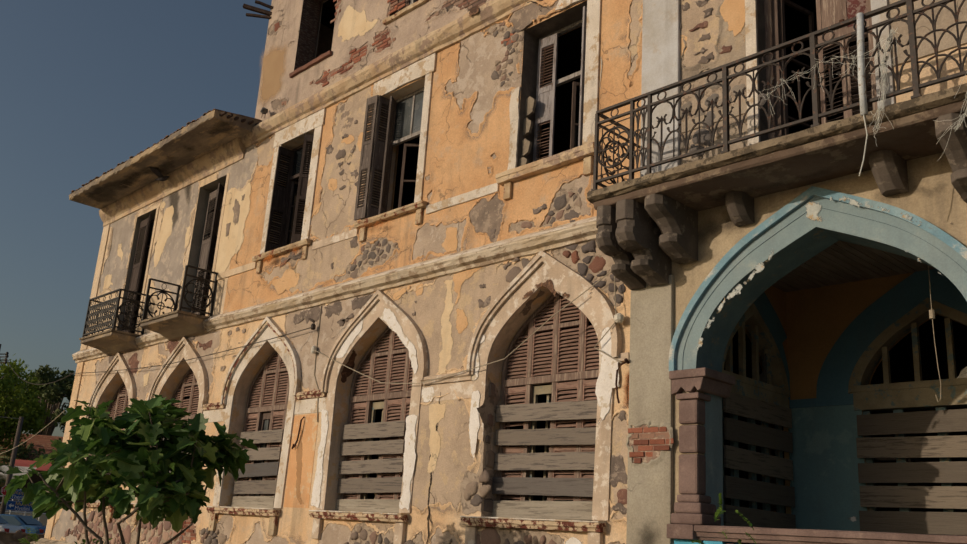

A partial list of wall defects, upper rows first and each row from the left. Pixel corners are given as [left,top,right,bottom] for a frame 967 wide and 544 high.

flaking render [310,0,406,88]
peeling [442,0,563,138]
peeling [259,85,594,296]
peeling [806,196,922,226]
peeling [697,251,774,349]
peeling [95,327,246,401]
peeling [284,240,630,544]
peeling [595,327,674,523]
flaking render [49,506,463,544]
crack [426,454,434,544]